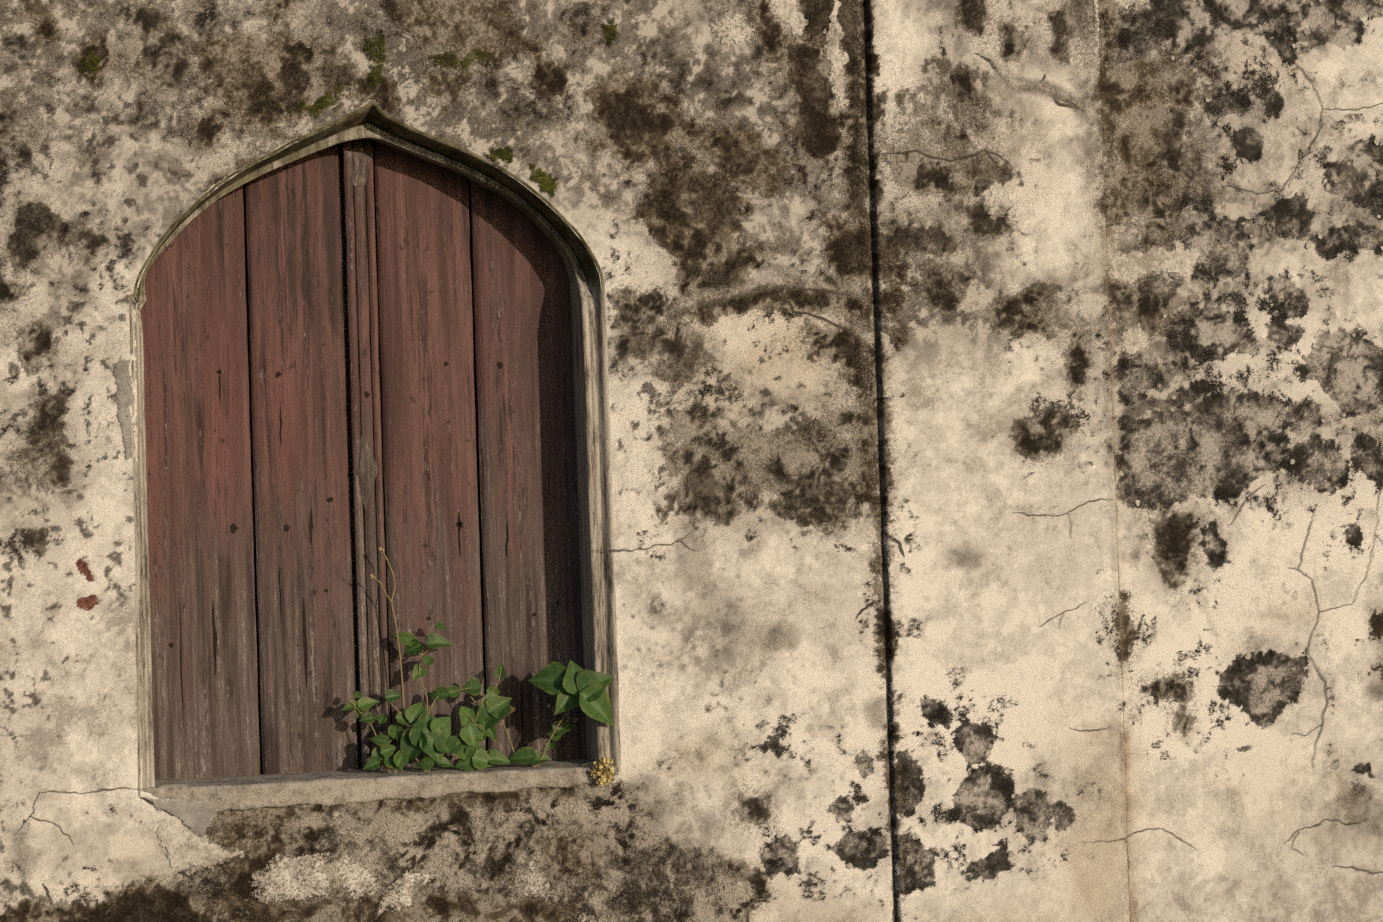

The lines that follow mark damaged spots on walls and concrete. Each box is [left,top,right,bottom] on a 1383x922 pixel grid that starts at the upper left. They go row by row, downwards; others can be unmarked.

damp [5,0,64,58]
damp [73,0,402,199]
crack [1200,47,1383,194]
damp [0,90,134,494]
damp [0,509,60,563]
spalling [76,555,100,611]
damp [381,0,1232,905]
crack [1289,465,1383,769]
flaking render [104,667,1102,922]